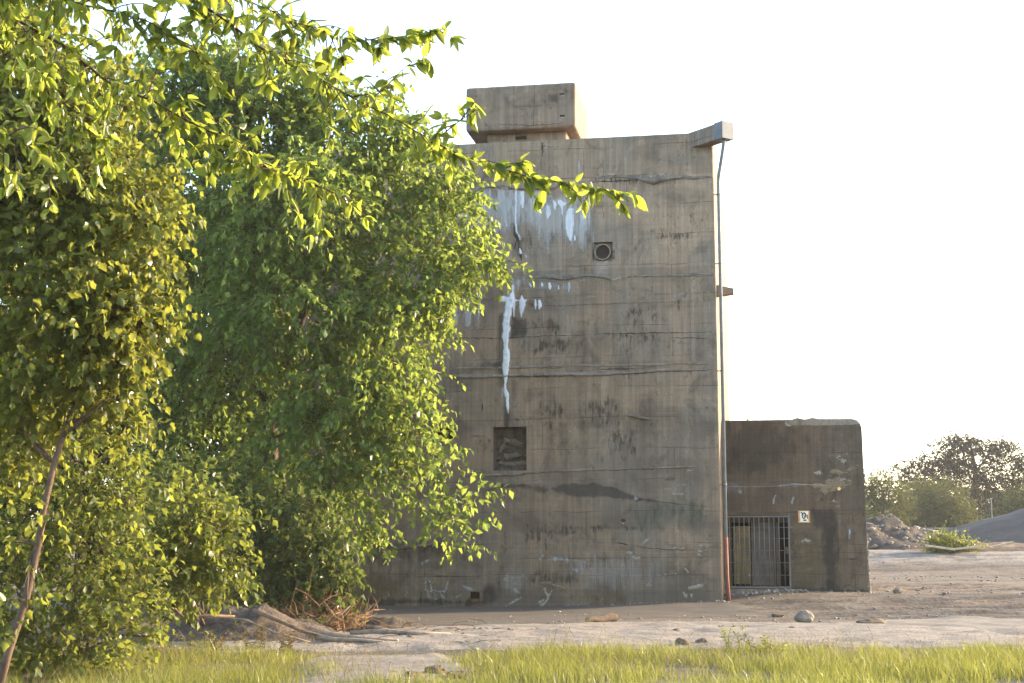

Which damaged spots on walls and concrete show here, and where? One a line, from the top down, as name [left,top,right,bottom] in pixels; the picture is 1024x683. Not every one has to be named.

damp [462,190,590,241]
damp [501,280,570,427]
damp [552,483,654,502]